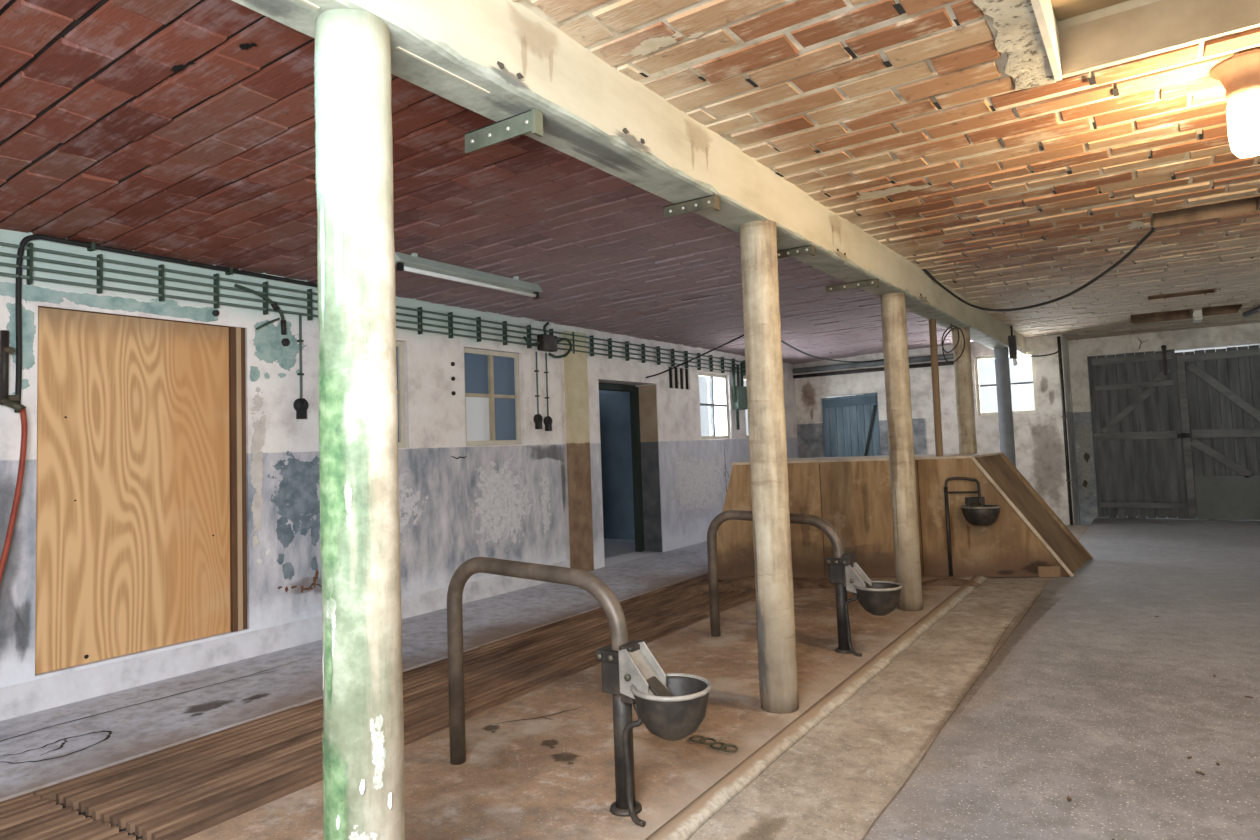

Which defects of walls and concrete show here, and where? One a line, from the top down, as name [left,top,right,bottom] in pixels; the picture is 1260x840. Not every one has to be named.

peeling [250,320,336,689]
peeling [359,714,392,809]
peeling [336,815,378,840]